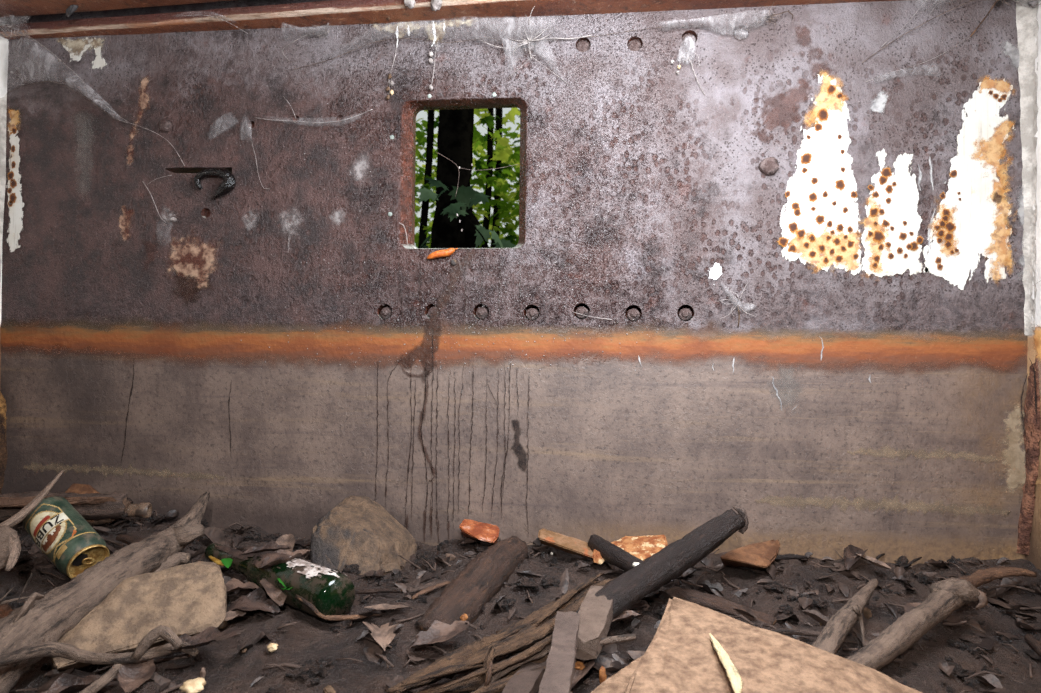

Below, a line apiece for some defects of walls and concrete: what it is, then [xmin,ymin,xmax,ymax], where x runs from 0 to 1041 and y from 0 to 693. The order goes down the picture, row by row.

peeling [57,37,107,69]
rust [127,77,150,164]
peeling [6,109,24,252]
rust [118,205,134,240]
peeling [778,71,1017,290]
rust [167,237,216,302]
rust [0,321,1041,371]
leakage [375,253,530,542]